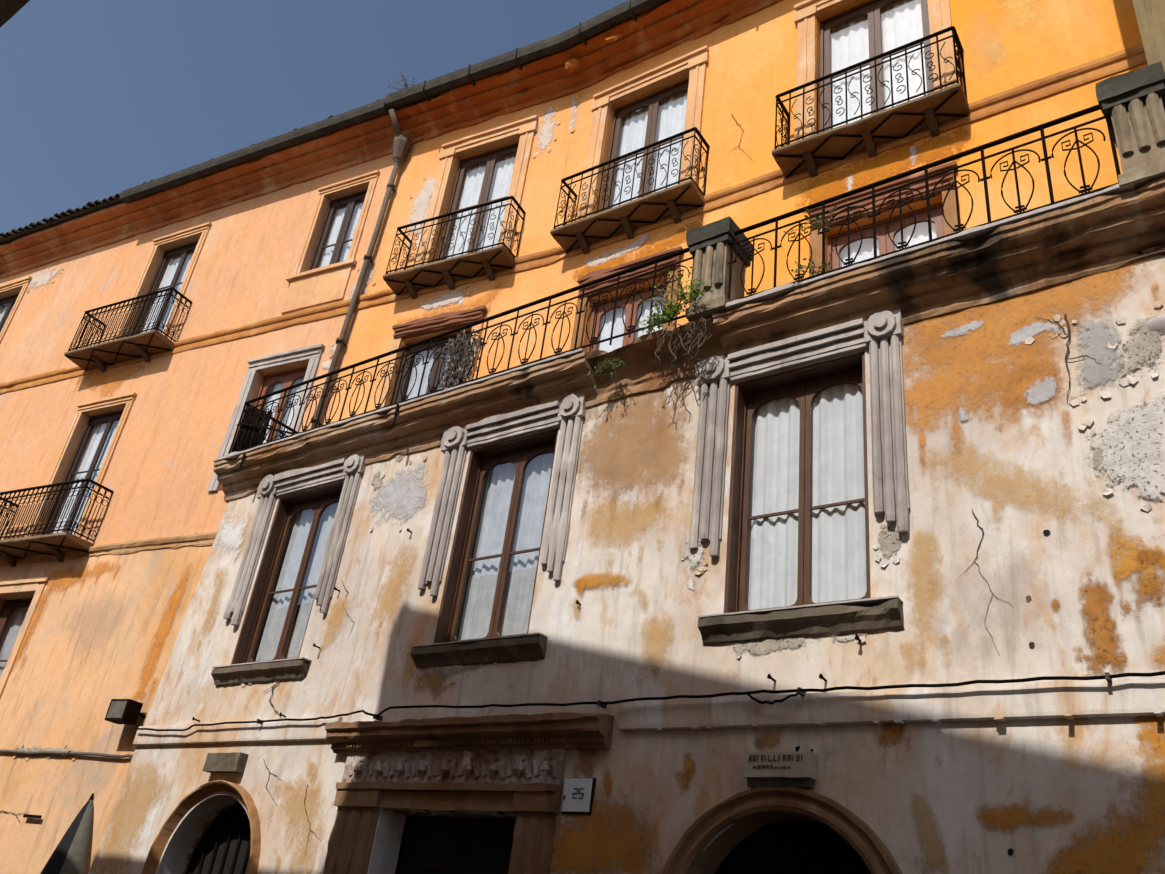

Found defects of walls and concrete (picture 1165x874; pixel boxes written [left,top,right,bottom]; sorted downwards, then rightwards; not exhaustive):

peeling [532,93,582,159]
peeling [26,266,64,293]
peeling [941,320,984,337]
water stain [903,263,1134,515]
crack [1035,314,1102,403]
spalling [1009,300,1165,512]
spalling [369,455,428,532]
crack [958,509,1011,654]